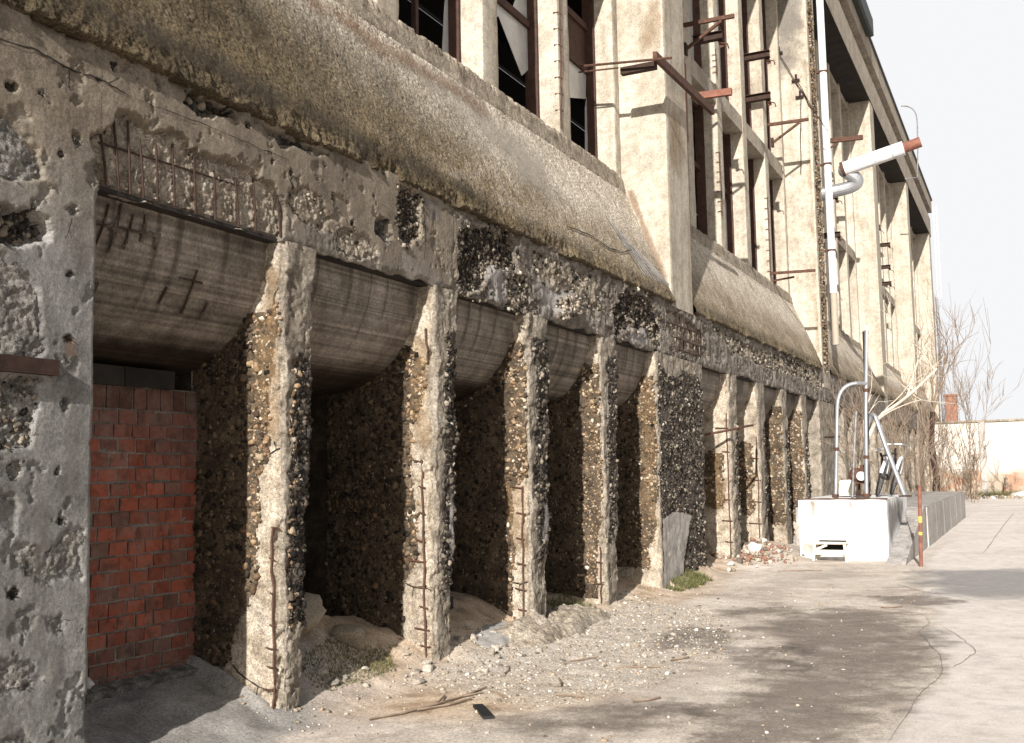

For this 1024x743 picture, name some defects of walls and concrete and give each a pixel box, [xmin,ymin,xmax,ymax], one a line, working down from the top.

spalling [0,203,40,246]
crack [0,38,297,189]
spalling [72,115,334,254]
spalling [440,0,830,619]
spalling [192,302,431,709]
crack [888,584,1022,742]